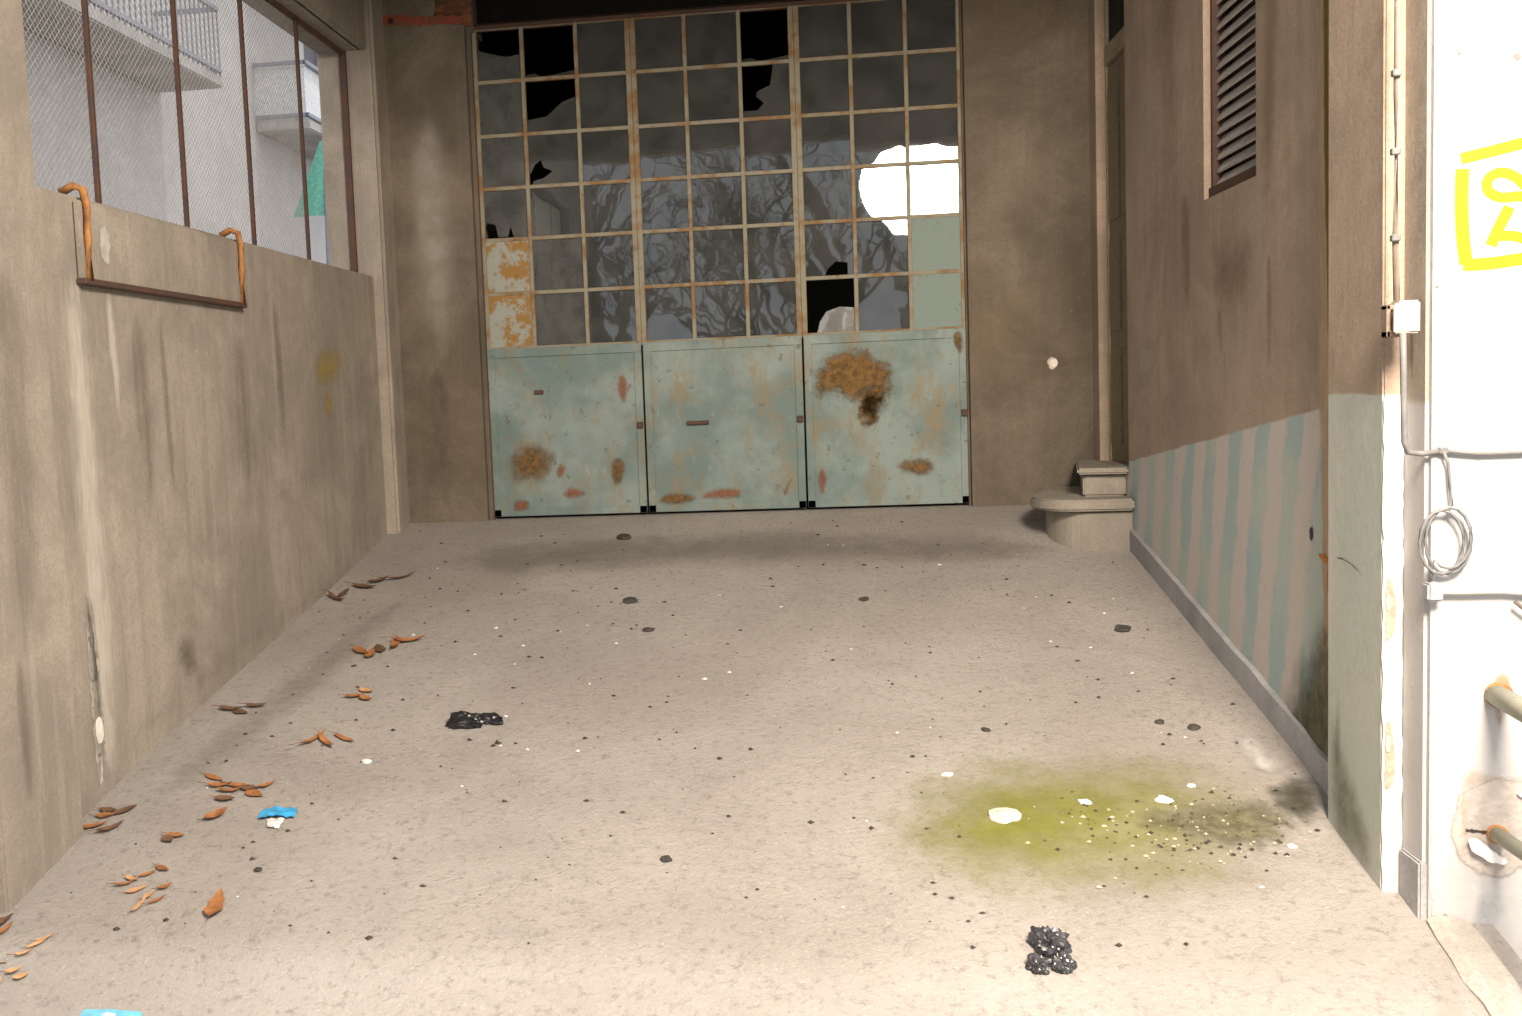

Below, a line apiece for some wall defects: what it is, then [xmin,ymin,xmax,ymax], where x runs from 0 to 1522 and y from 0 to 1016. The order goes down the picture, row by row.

spalling [383,0,473,26]
rust [816,351,891,425]
rust [513,448,583,497]
peeling [1381,395,1404,892]
spalling [1429,737,1522,917]